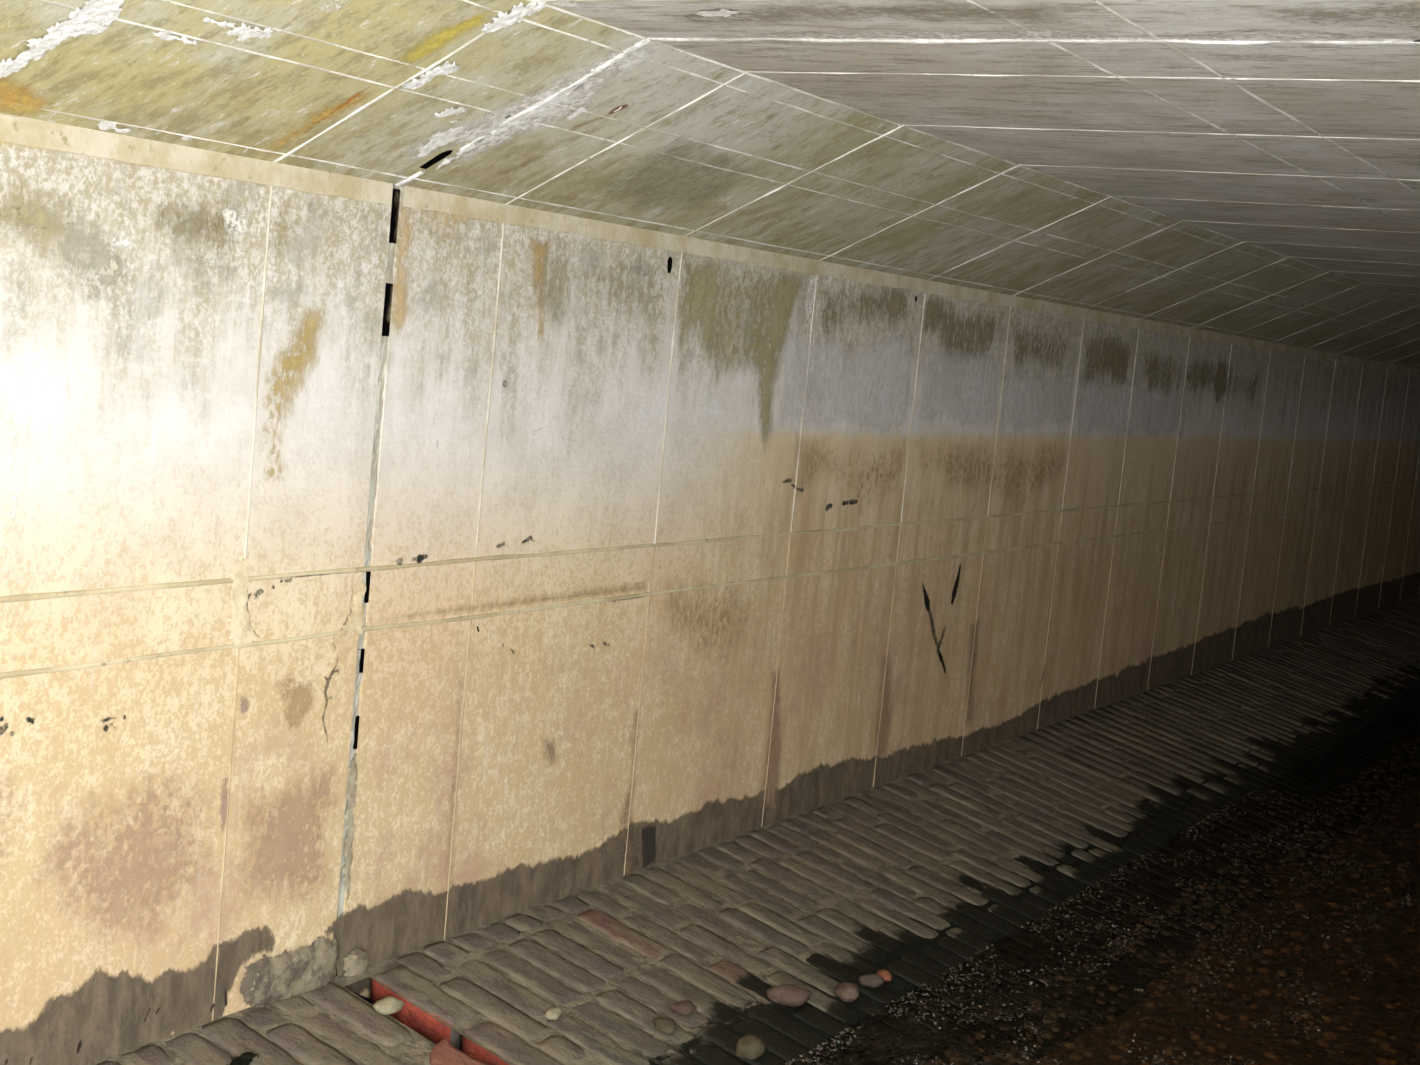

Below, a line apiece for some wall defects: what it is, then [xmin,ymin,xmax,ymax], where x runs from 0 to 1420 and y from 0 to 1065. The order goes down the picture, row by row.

leakage [0,0,124,78]
leakage [153,30,198,45]
leakage [203,17,273,41]
leakage [398,0,584,90]
leakage [97,121,131,134]
leakage [409,37,651,170]
leakage [782,337,1187,434]
crack [322,646,338,736]
leakage [0,926,274,1065]